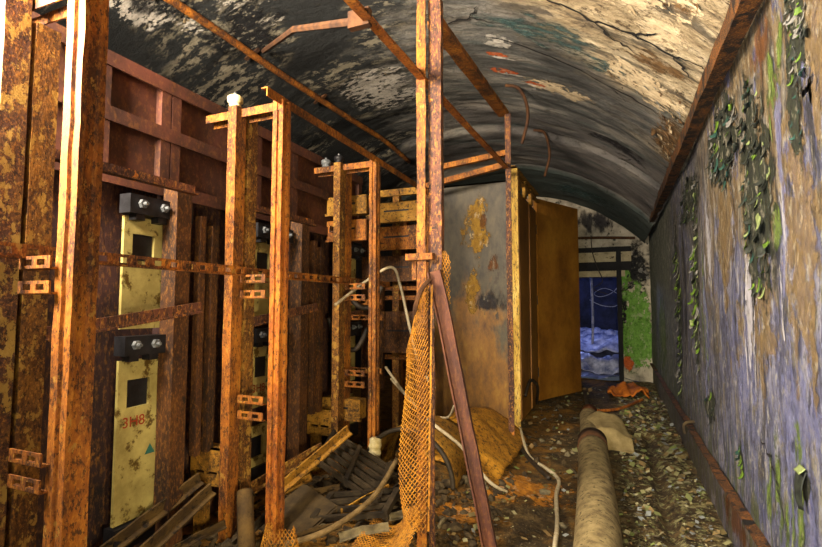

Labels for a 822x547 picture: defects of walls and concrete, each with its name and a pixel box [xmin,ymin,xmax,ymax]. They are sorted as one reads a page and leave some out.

peeling [109,0,202,35]
peeling [340,66,428,111]
peeling [484,34,592,105]
crack [448,6,672,128]
crack [546,0,704,78]
peeling [604,55,688,162]
peeling [603,0,709,53]
rust [750,0,771,81]
water stain [701,0,822,547]